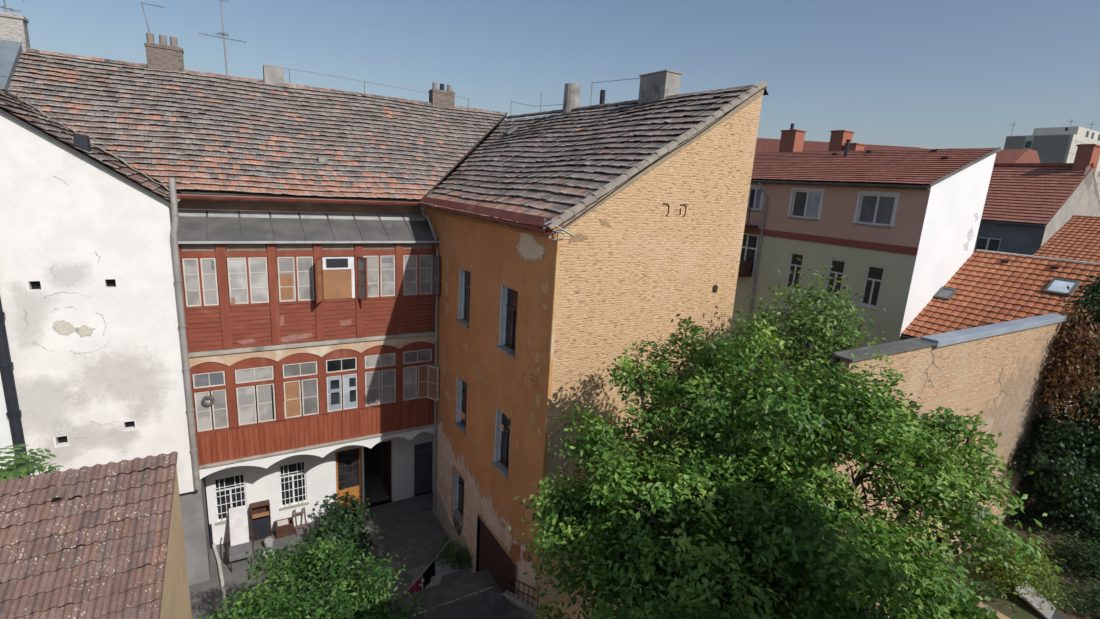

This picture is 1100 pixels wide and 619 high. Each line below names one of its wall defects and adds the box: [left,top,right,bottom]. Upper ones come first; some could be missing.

peeling [516,232,547,264]
peeling [53,320,95,337]
flaking render [434,416,537,604]